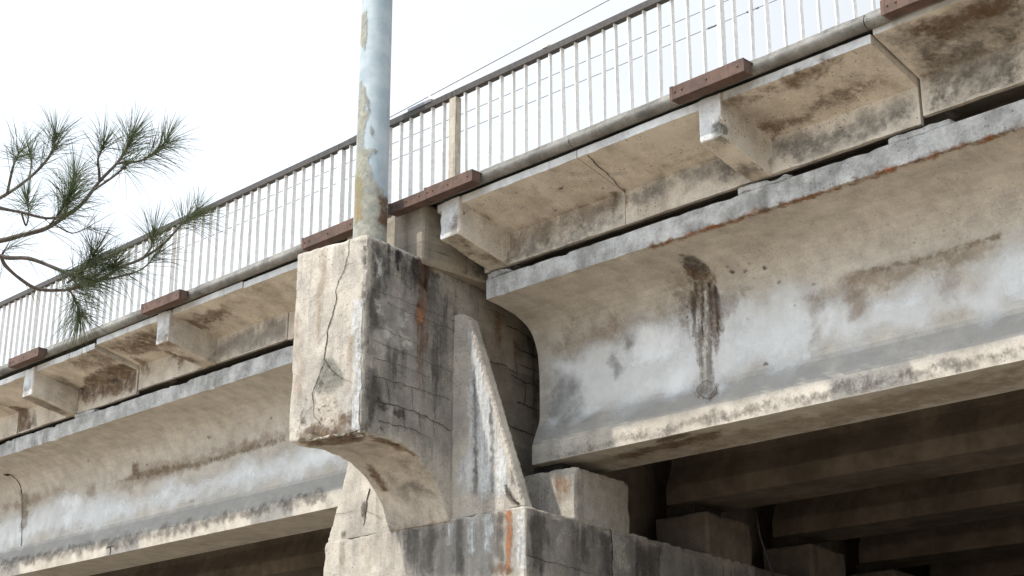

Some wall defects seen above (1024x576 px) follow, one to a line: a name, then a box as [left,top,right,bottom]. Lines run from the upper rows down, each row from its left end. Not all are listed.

damp [783,59,834,88]
peeling [353,80,388,261]
corrosion [649,178,859,248]
corrosion [915,129,1015,163]
crack [299,238,455,438]
damp [348,244,439,437]
damp [456,330,514,498]
crack [490,325,540,435]
damp [550,251,1024,424]
damp [0,440,344,569]
crack [334,489,382,537]
corrosion [492,511,512,574]